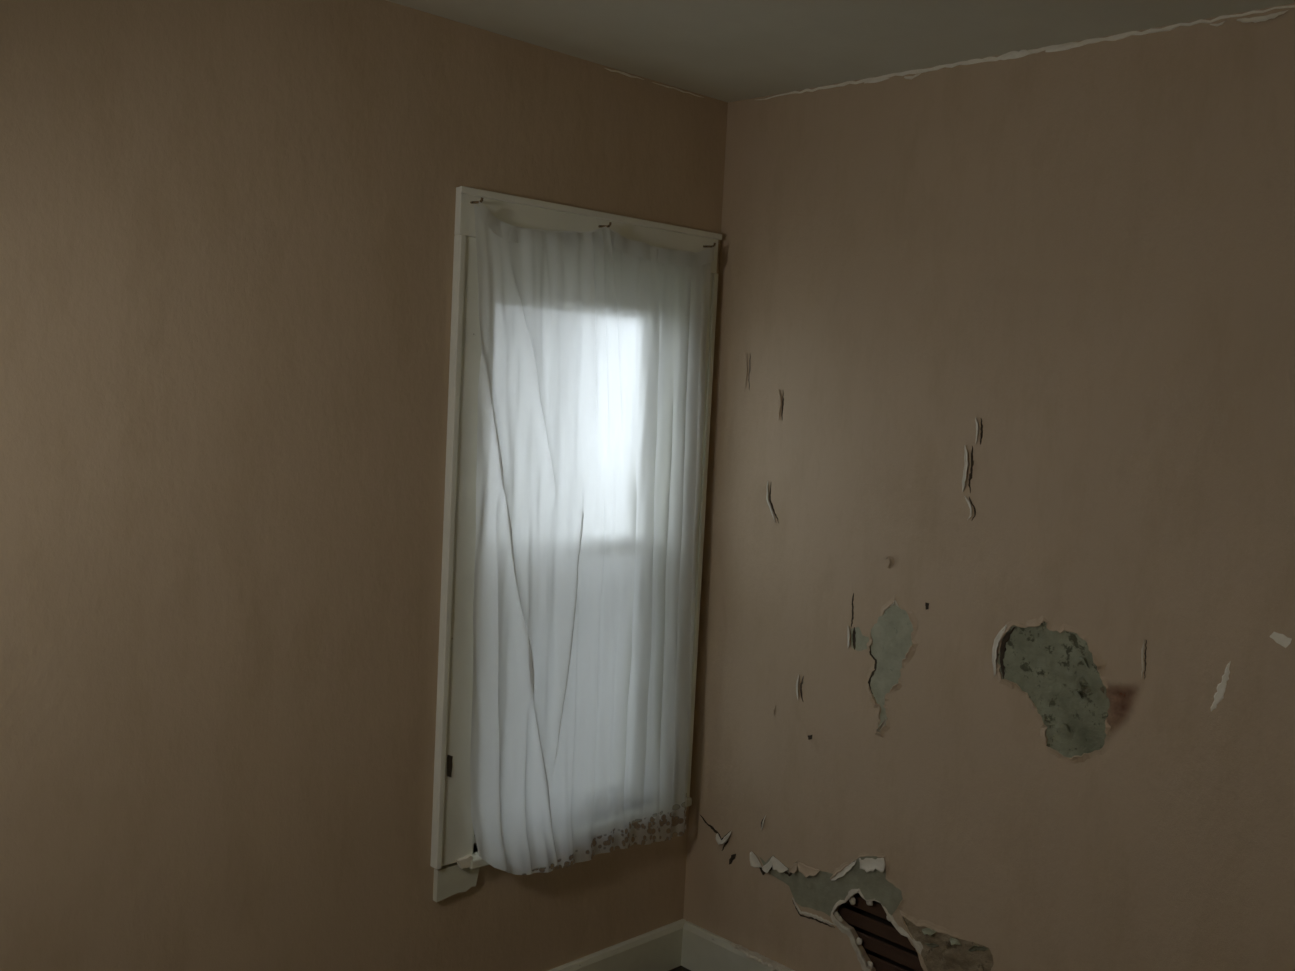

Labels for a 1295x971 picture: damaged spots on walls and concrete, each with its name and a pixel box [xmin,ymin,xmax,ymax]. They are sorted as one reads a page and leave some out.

peeling [962,418,978,520]
peeling [847,593,929,738]
peeling [992,615,1114,764]
spalling [750,851,998,971]